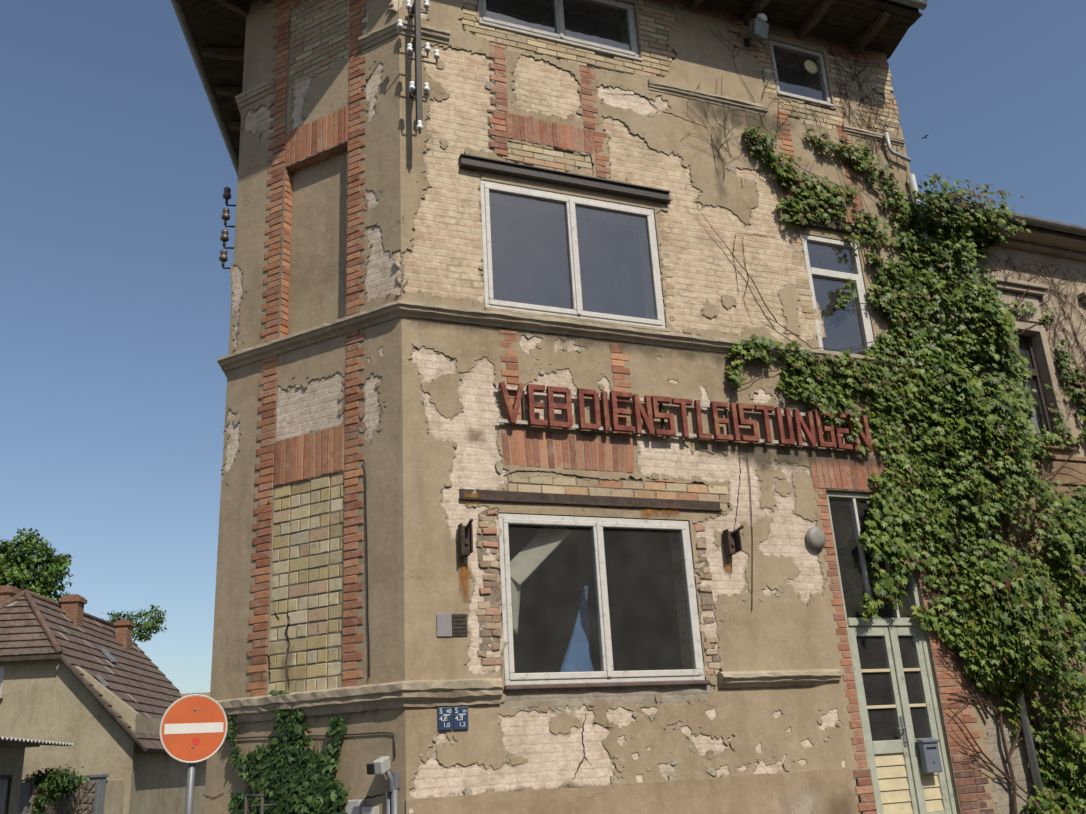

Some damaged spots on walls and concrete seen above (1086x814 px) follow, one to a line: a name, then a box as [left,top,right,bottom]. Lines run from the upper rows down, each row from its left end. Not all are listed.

flaking render [242,72,316,142]
flaking render [354,0,826,344]
flaking render [274,372,387,452]
rust [460,562,471,599]
flaking render [409,330,843,814]
crack [255,607,290,688]
crack [573,718,591,779]